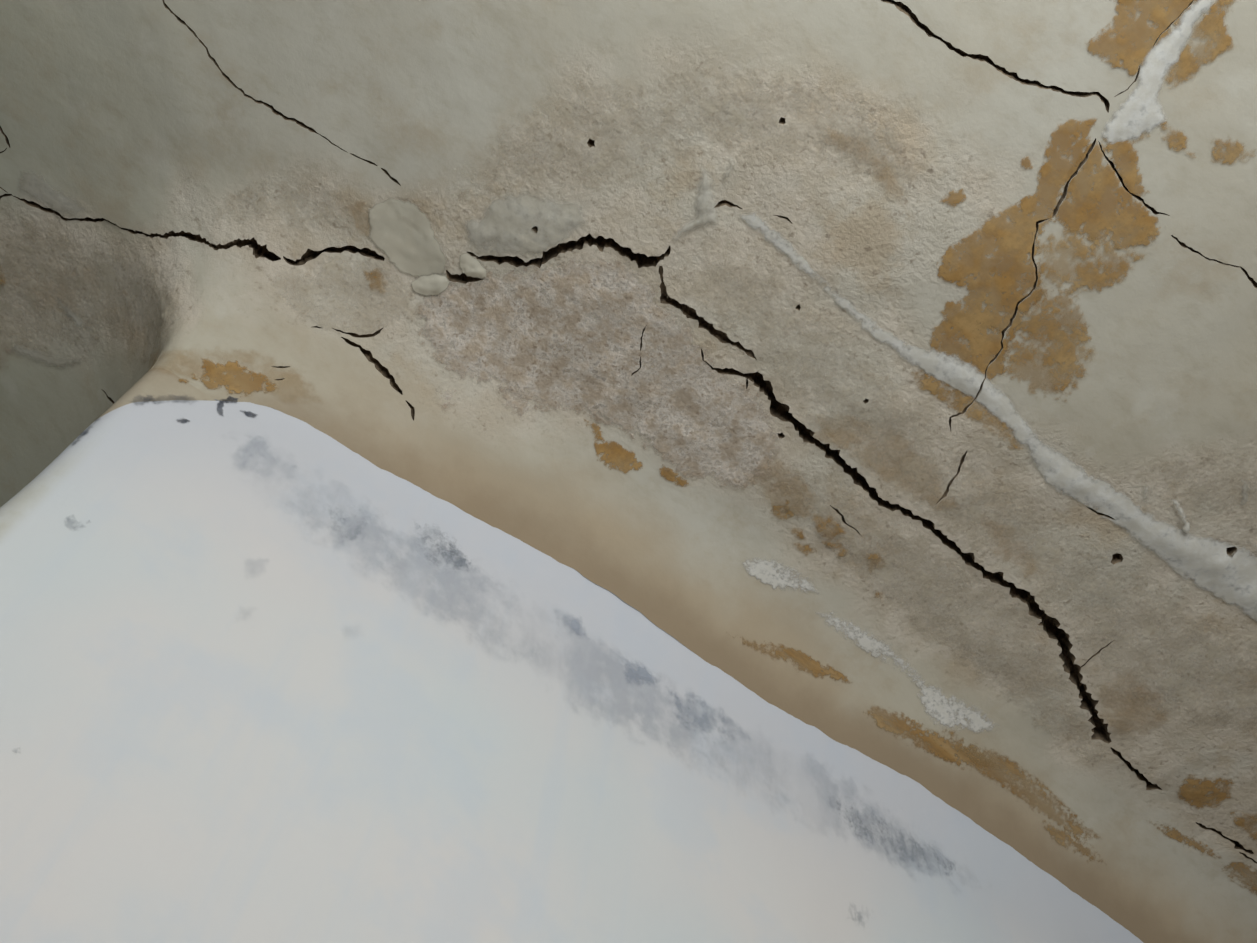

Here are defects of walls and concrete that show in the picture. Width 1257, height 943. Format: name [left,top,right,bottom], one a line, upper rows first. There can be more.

peeling [1088,0,1233,82]
crack [162,0,401,186]
crack [0,187,385,266]
peeling [930,119,1160,399]
peeling [179,359,275,396]
crack [313,326,415,420]
flaking render [369,198,778,488]
crack [446,0,1257,790]
peeling [743,639,848,683]
leakage [821,612,923,687]
peeling [868,707,1098,860]
crack [1196,822,1257,864]